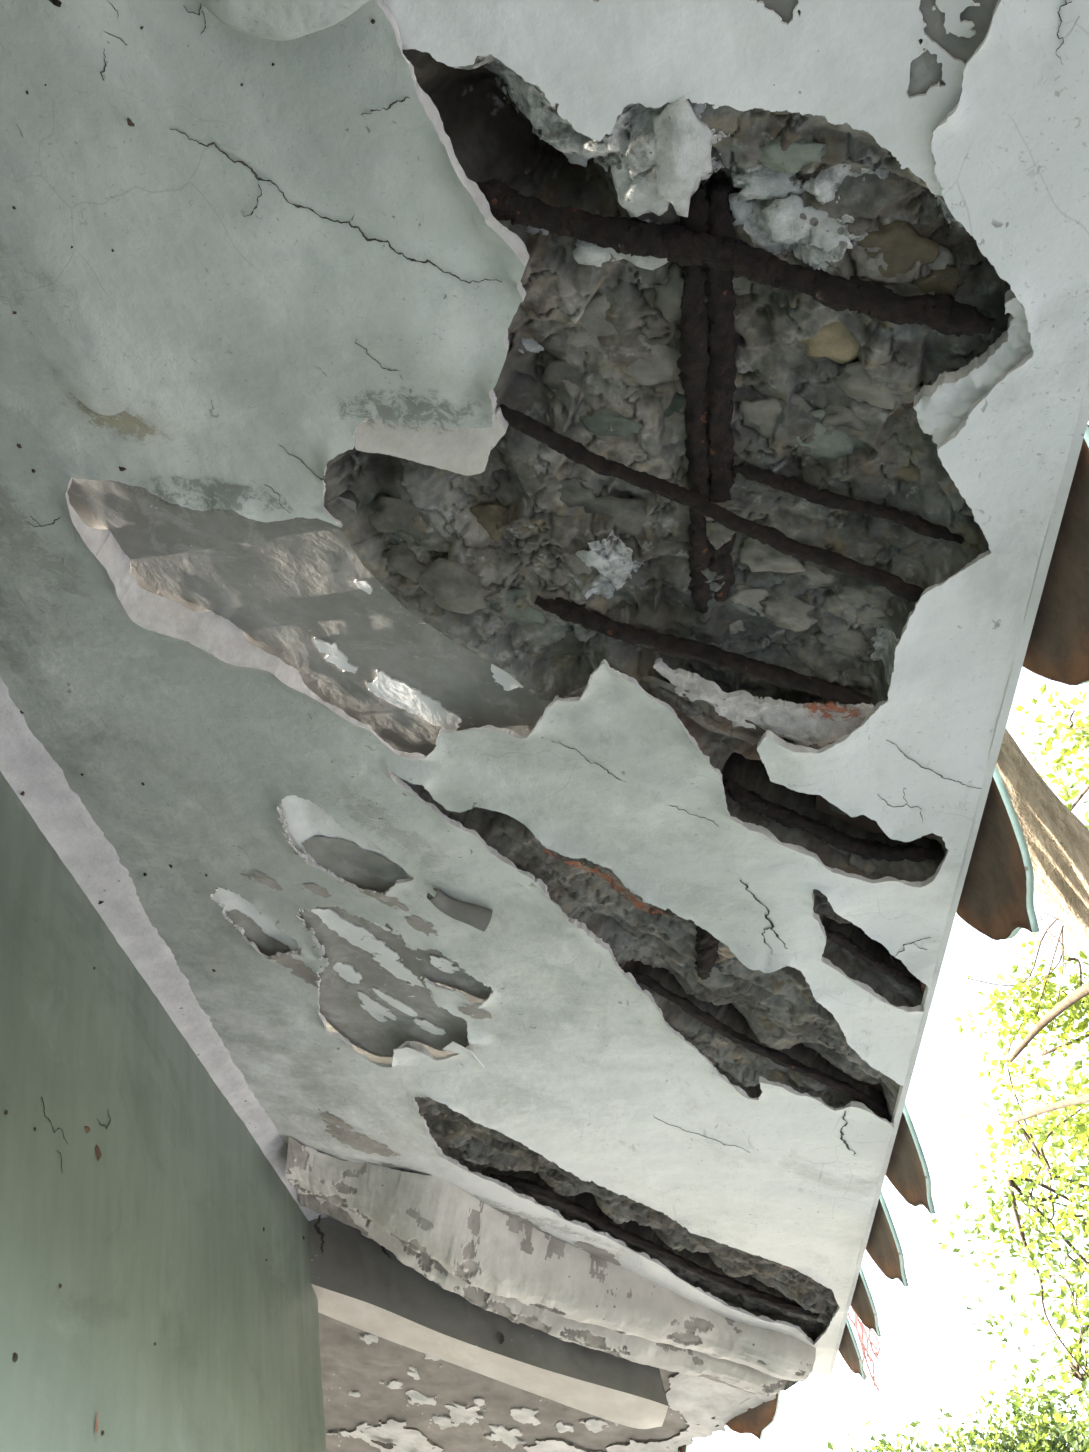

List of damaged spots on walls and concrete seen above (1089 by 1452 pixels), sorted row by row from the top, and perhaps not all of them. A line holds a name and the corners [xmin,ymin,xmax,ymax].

crack [49,0,62,8]
crack [170,129,502,284]
spalling [67,0,1032,882]
peeling [213,795,493,1067]
spalling [400,778,900,1123]
crack [740,880,788,949]
spalling [813,889,926,1007]
peeling [318,1109,412,1173]
spalling [414,1097,838,1342]